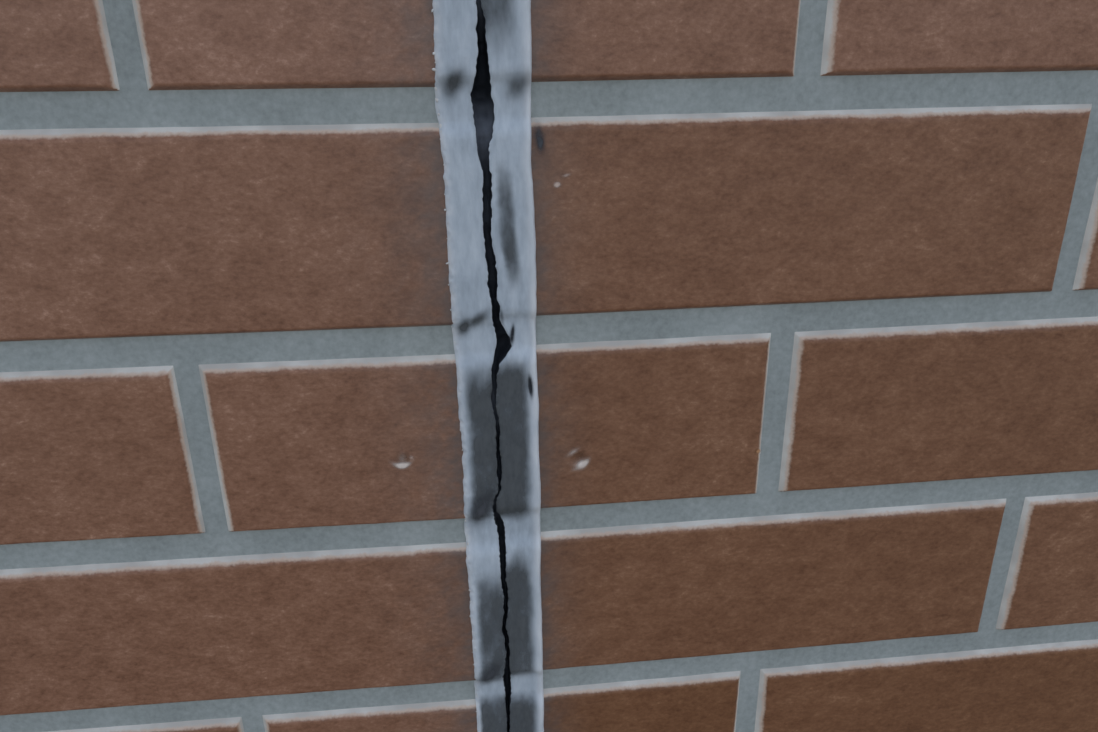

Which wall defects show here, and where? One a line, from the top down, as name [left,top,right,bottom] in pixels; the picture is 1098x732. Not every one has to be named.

crack [470,0,514,732]